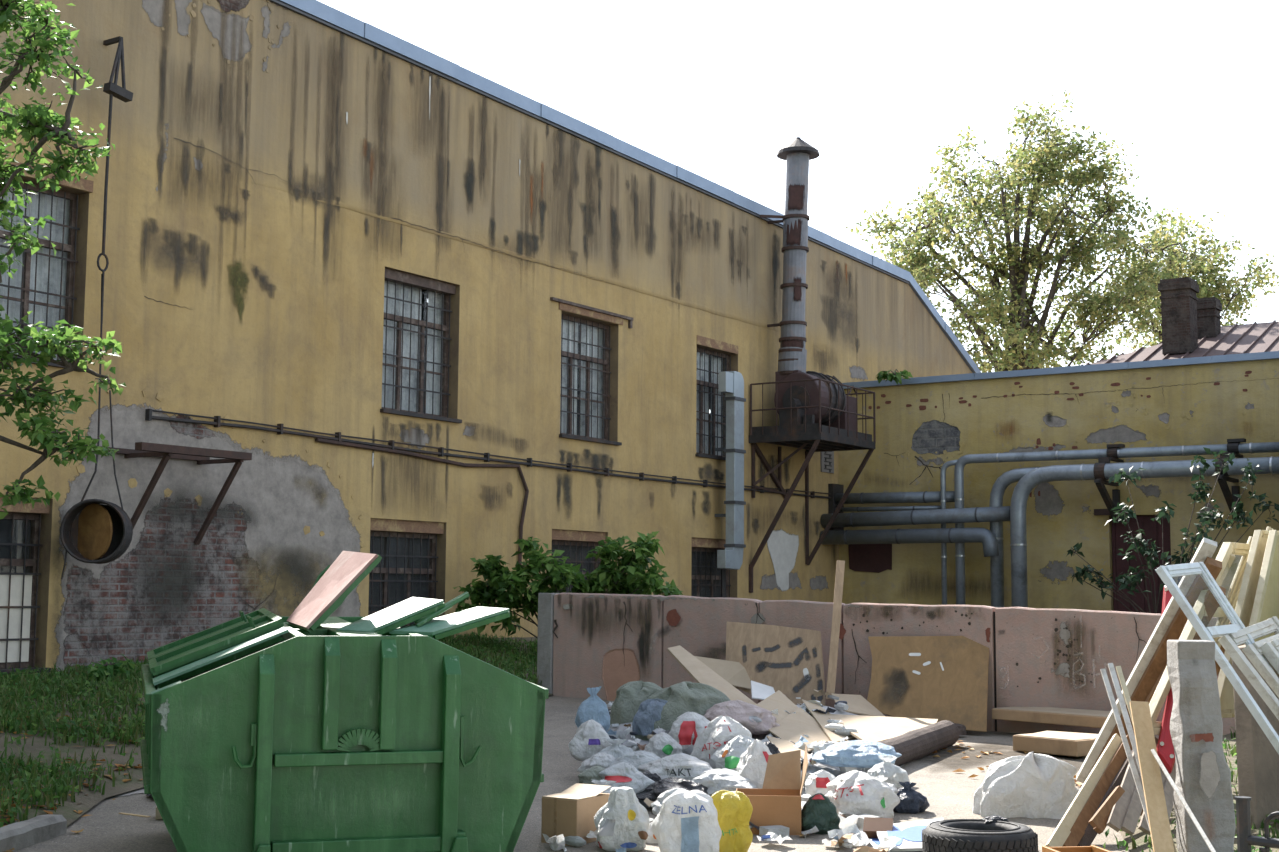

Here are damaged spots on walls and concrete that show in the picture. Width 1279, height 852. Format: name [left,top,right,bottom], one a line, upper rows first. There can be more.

leakage [160,0,169,122]
flaking render [142,0,291,73]
leakage [188,13,249,220]
leakage [289,33,348,256]
leakage [465,97,496,199]
leakage [491,124,654,262]
corrosion [785,183,805,246]
corrosion [793,277,802,302]
corrosion [781,340,804,348]
flaking render [1004,377,1151,453]
flaking render [54,388,365,674]
leakage [558,595,660,670]